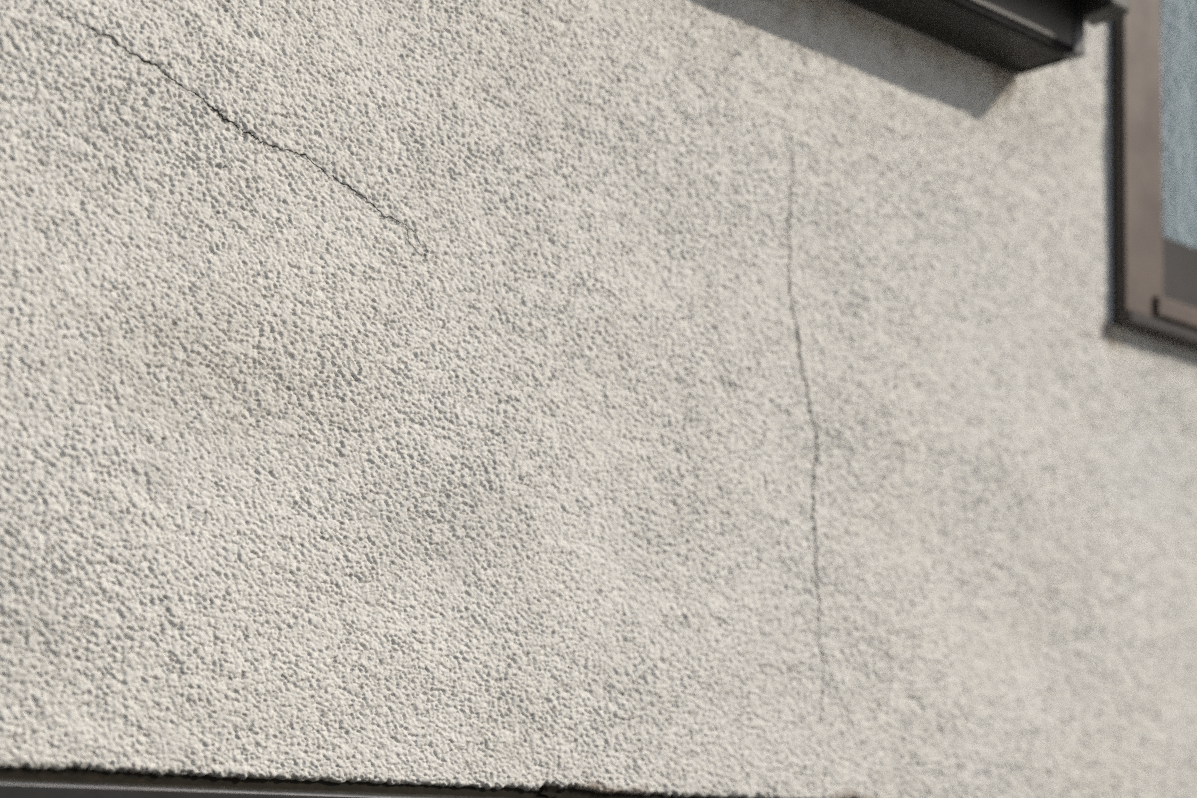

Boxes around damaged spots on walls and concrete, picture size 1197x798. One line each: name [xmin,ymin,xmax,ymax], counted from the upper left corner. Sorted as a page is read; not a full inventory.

crack [46,0,429,261]
crack [787,130,833,722]